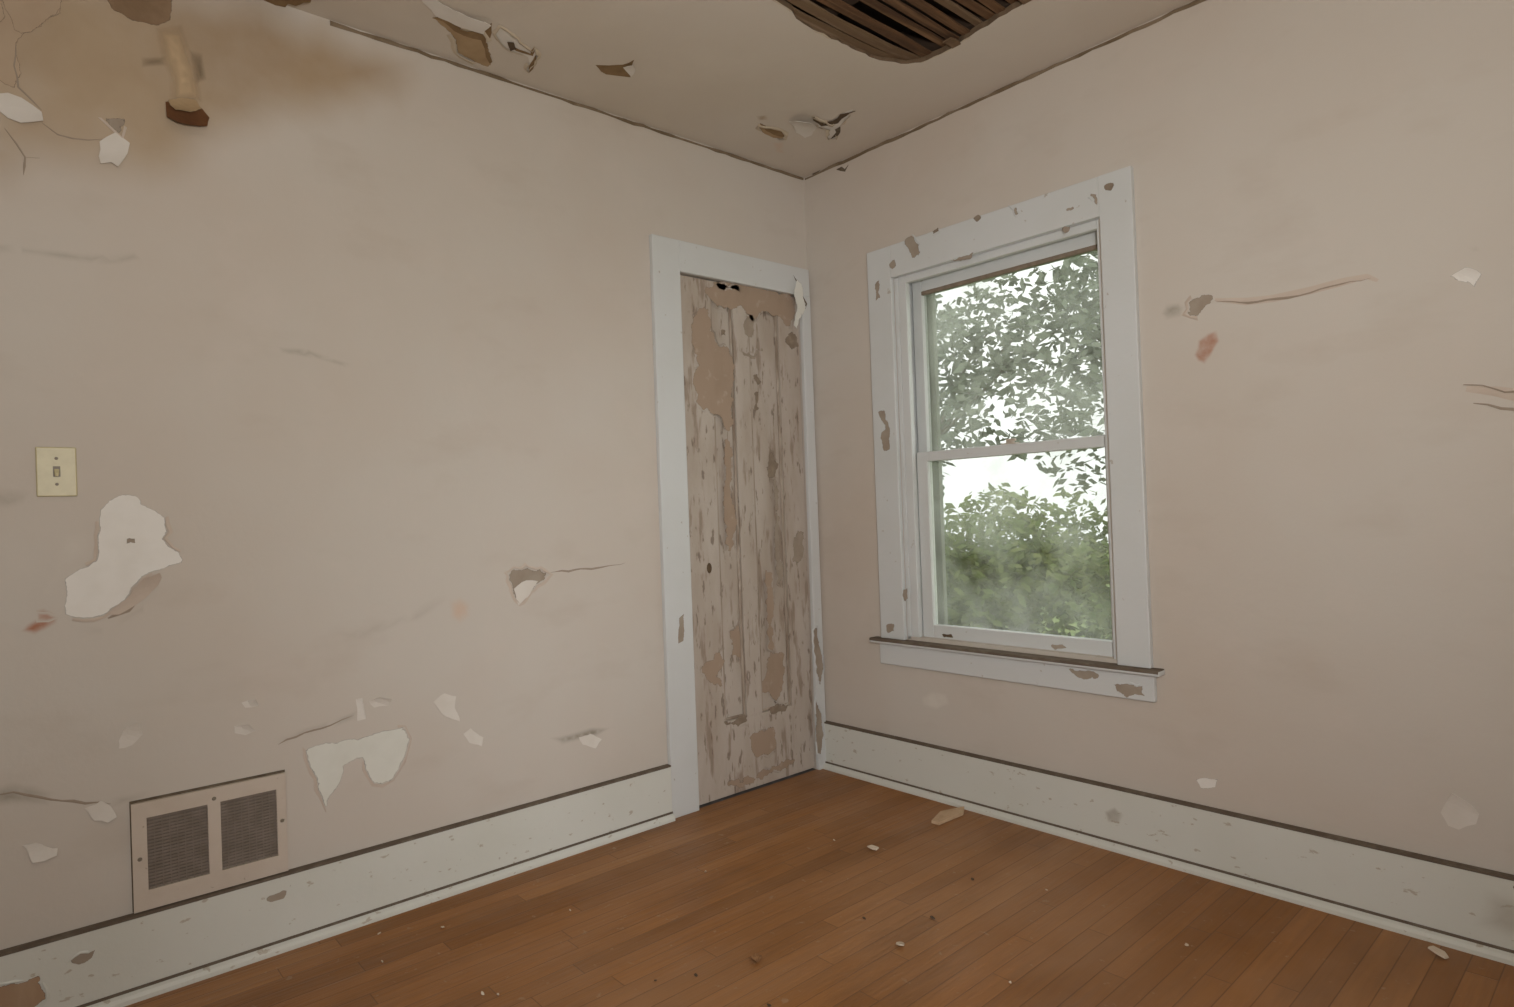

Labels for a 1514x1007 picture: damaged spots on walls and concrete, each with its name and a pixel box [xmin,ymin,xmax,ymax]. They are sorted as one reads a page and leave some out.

peeling [108,0,172,26]
peeling [422,0,541,73]
flaking render [773,0,1032,63]
peeling [596,60,635,77]
peeling [0,93,43,123]
peeling [98,117,130,166]
peeling [755,109,855,154]
crack [1215,274,1379,305]
peeling [65,495,182,622]
peeling [504,563,554,606]
peeling [302,698,412,812]
peeling [0,977,50,1007]